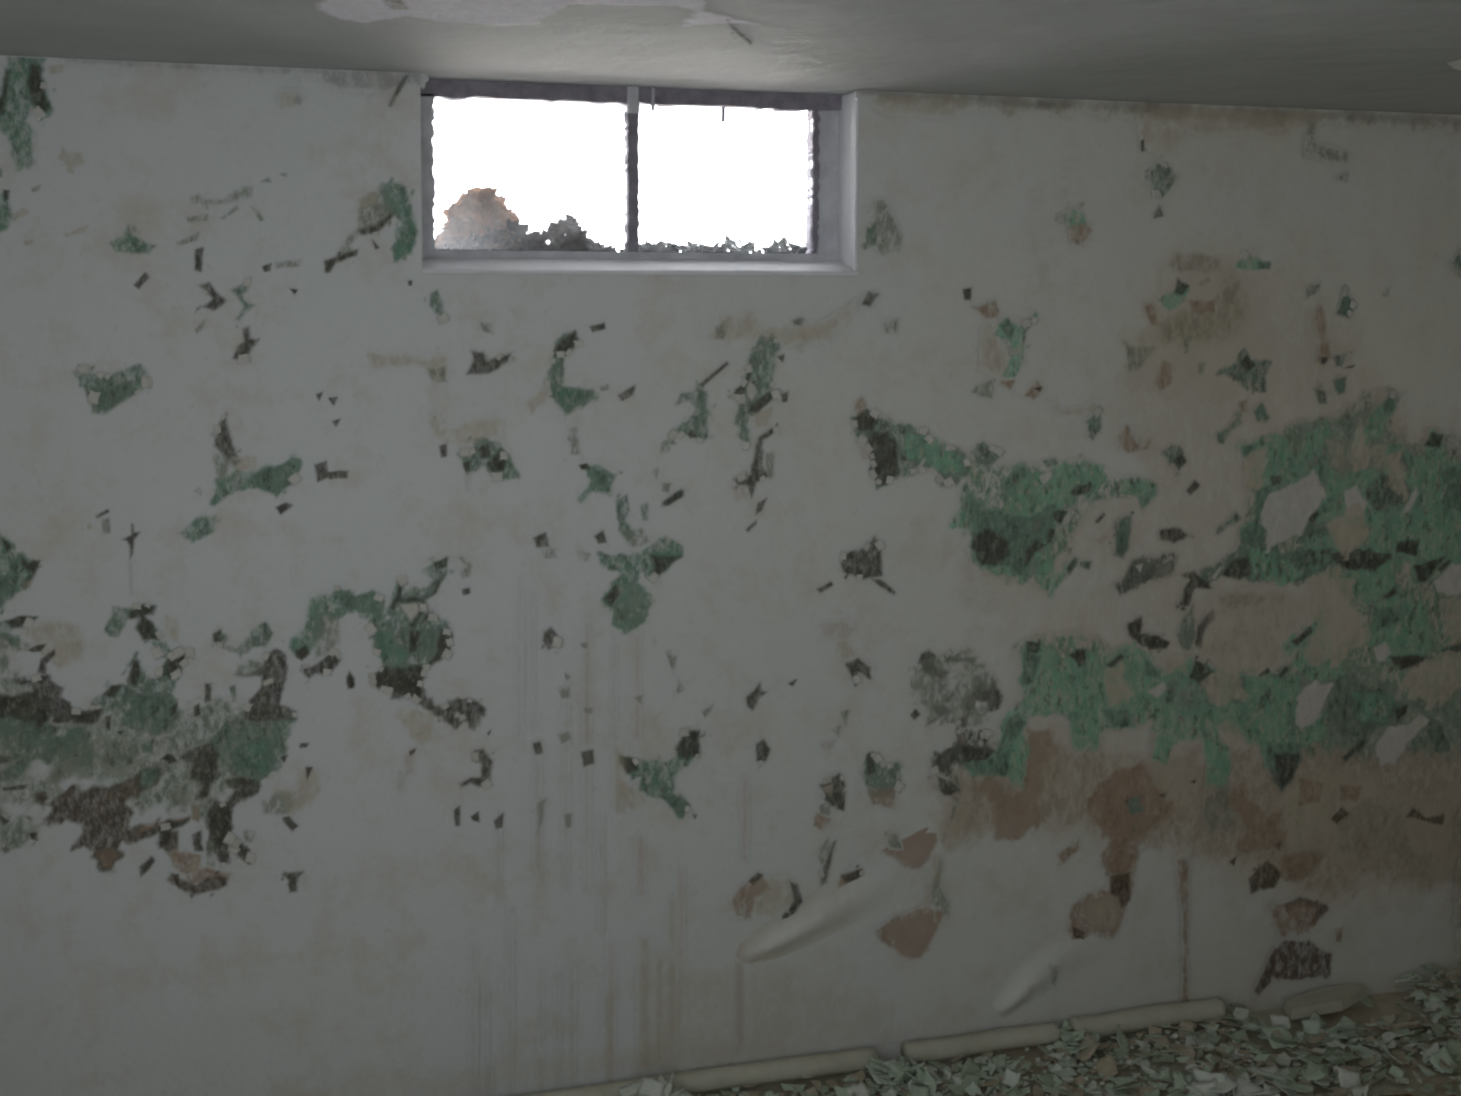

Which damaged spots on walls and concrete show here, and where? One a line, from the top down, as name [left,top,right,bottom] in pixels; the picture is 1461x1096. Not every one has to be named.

peeling [0,57,65,246]
peeling [193,176,450,364]
peeling [70,352,152,416]
peeling [170,411,350,545]
peeling [524,321,790,700]
peeling [815,534,897,597]
peeling [847,233,1461,998]
water stain [916,220,1449,742]
peeling [0,528,505,900]
peeling [629,702,715,820]
peeling [730,750,905,926]
water stain [1144,850,1455,931]